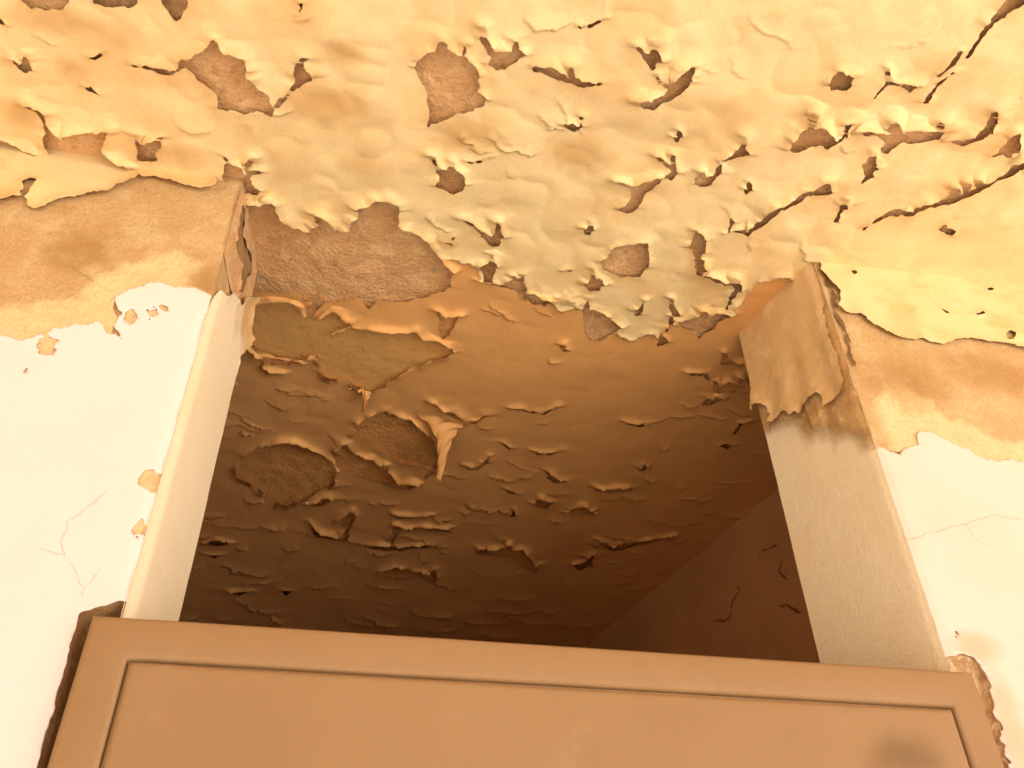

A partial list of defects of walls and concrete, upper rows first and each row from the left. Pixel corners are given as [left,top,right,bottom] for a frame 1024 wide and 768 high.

peeling [0,5,23,28]
flaking render [21,0,69,11]
flaking render [93,0,138,8]
flaking render [120,26,330,117]
flaking render [403,12,541,127]
flaking render [617,22,716,110]
flaking render [812,54,929,91]
flaking render [604,95,1024,238]
flaking render [682,220,752,293]
flaking render [0,89,734,621]
flaking render [713,262,1024,462]
crack [759,544,802,613]